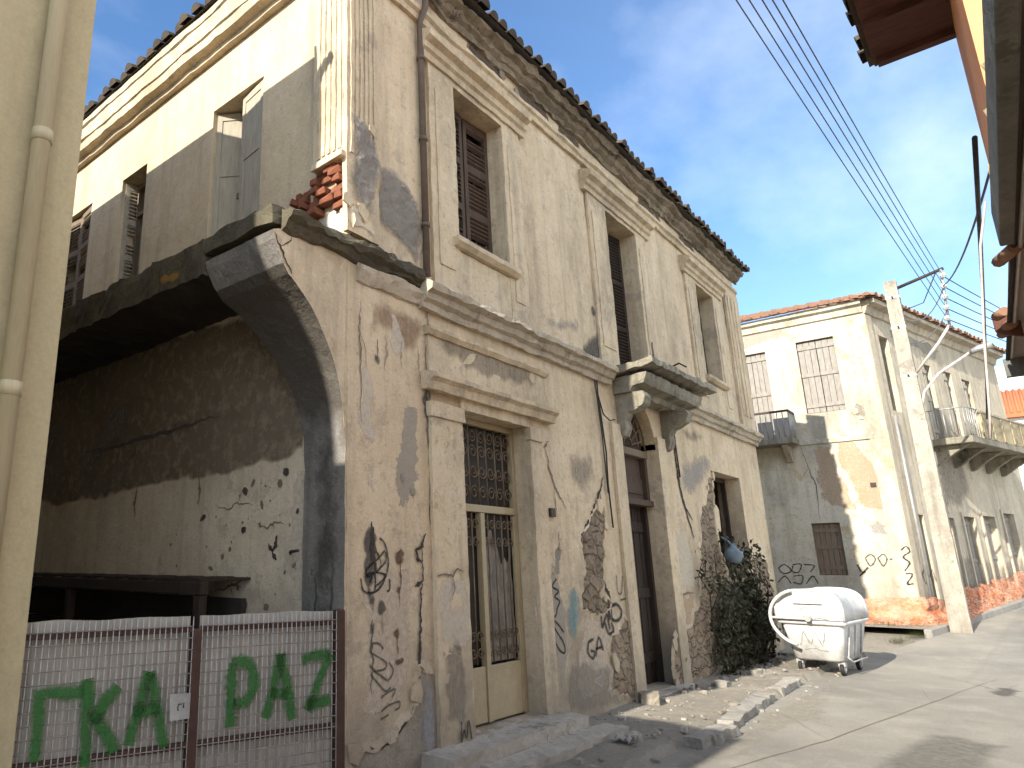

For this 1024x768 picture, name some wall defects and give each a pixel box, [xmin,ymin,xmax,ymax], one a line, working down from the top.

flaking render [289,118,423,269]
crack [84,416,219,465]
crack [217,490,284,529]
peeling [396,407,419,506]
crack [543,441,566,510]
crack [674,447,694,537]
crack [801,449,820,518]
spalling [577,498,636,703]
spalling [671,471,729,686]
spalling [345,549,438,768]